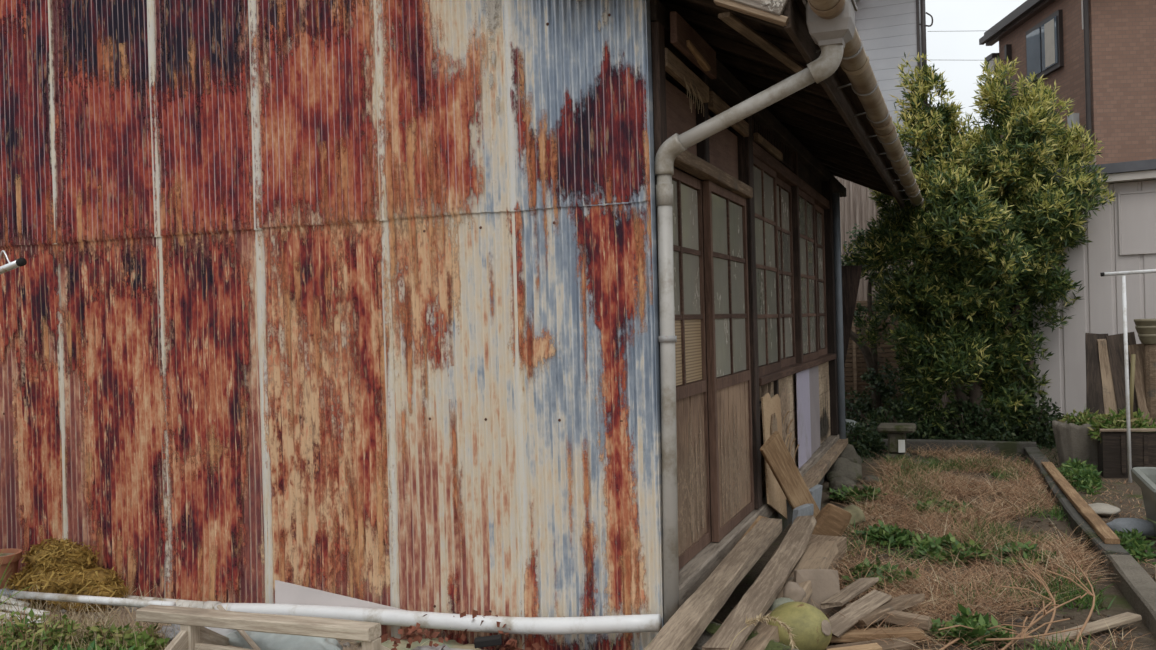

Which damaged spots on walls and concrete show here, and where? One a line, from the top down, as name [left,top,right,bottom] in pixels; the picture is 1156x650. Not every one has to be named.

rust [0,0,488,603]
rust [506,41,653,617]